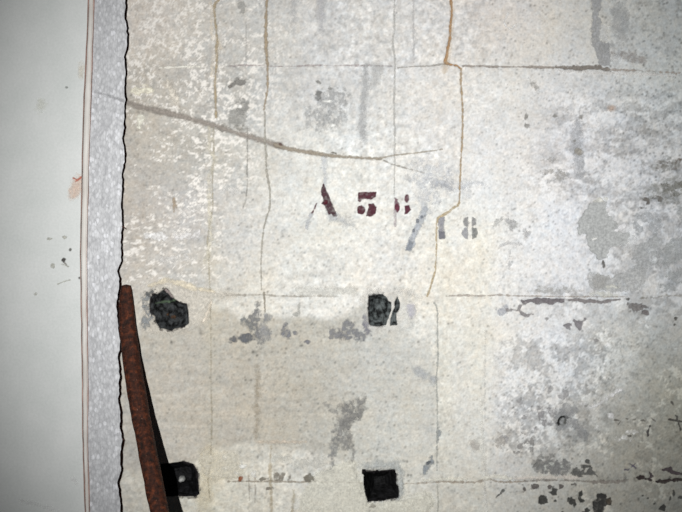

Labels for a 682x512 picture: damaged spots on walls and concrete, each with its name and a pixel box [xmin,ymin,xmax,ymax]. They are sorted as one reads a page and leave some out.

corrosion [119,284,169,512]
crack [100,0,443,512]
crack [427,0,464,466]